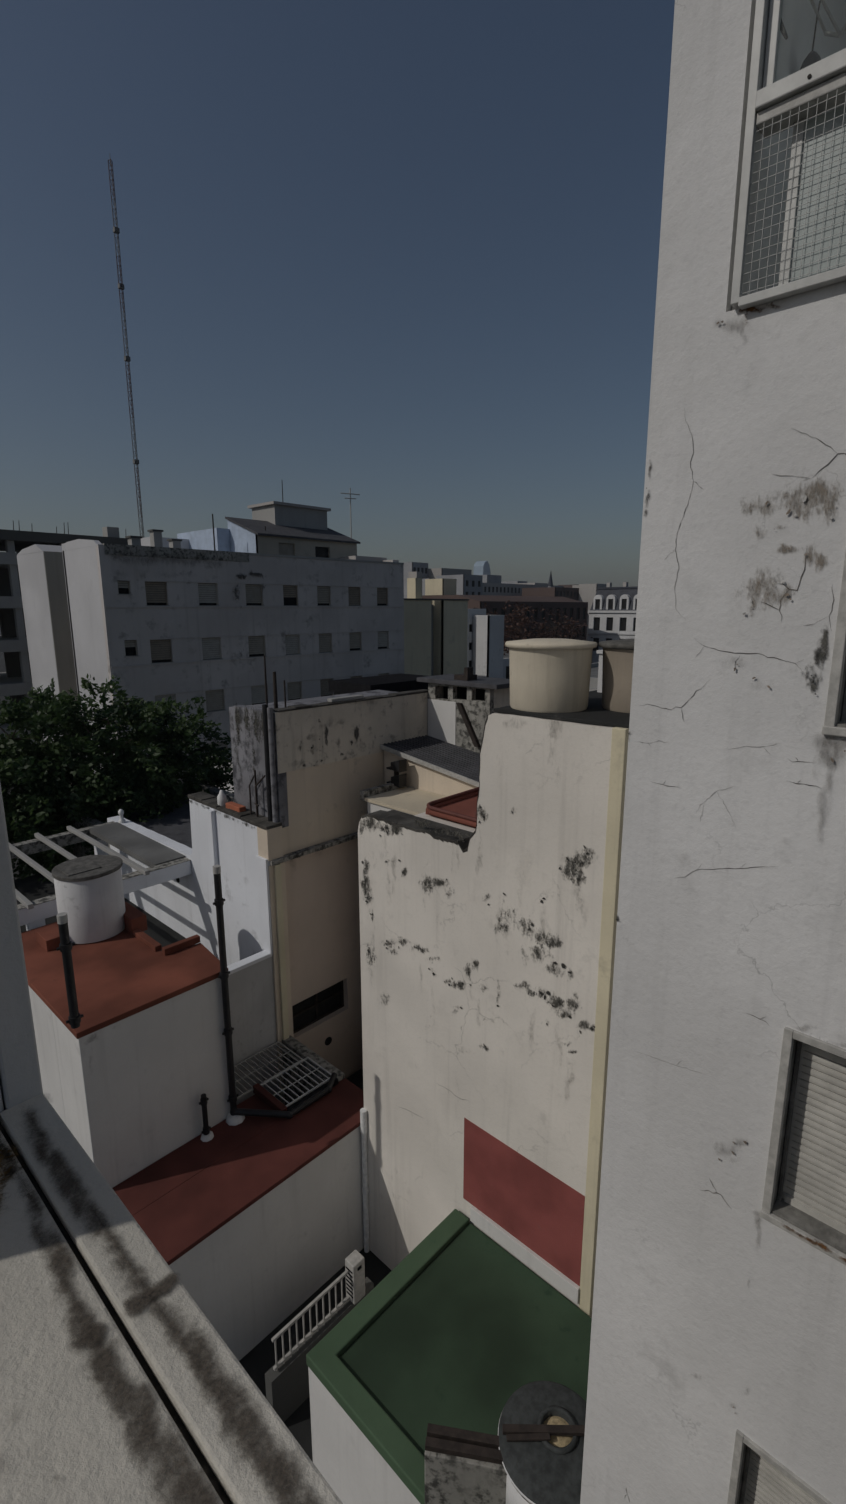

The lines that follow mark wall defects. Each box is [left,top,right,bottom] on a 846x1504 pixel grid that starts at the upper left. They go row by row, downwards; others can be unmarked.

crack [774,429,846,480]
peeling [749,482,836,569]
water stain [805,629,828,695]
water stain [0,1111,318,1504]